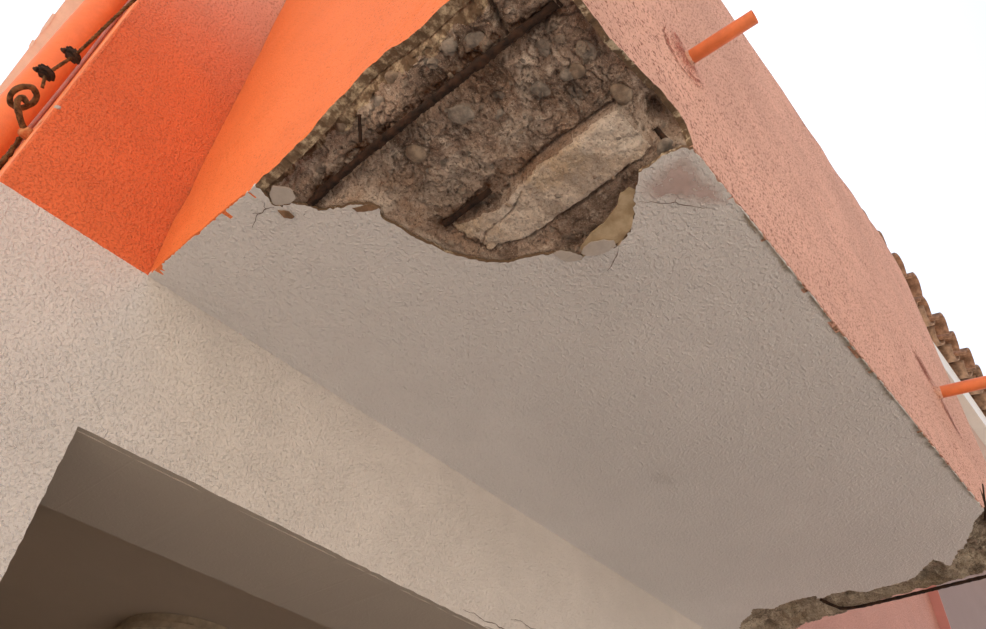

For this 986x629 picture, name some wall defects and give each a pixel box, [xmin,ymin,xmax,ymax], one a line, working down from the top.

spalling [264,0,686,262]
spalling [740,484,986,629]